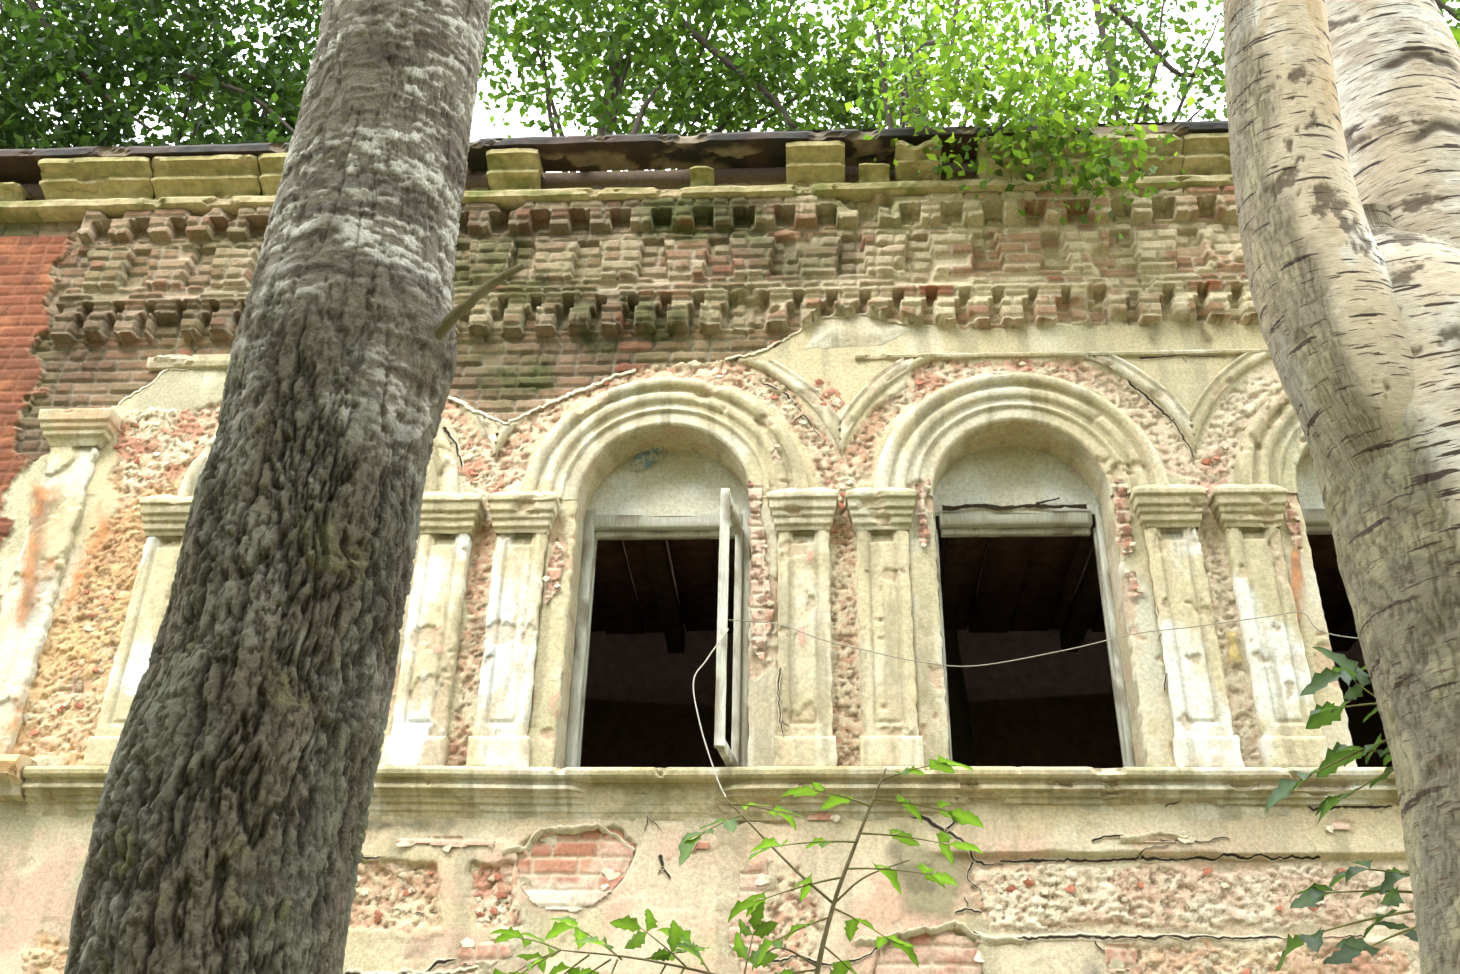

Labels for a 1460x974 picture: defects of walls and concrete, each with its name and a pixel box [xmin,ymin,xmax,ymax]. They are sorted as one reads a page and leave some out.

spalling [458,441,504,532]
spalling [1193,444,1229,499]
spalling [18,407,208,758]
spalling [748,481,774,660]
spalling [352,822,635,974]
spalling [854,861,1411,974]
crack [906,800,1366,953]
crack [1302,804,1393,814]